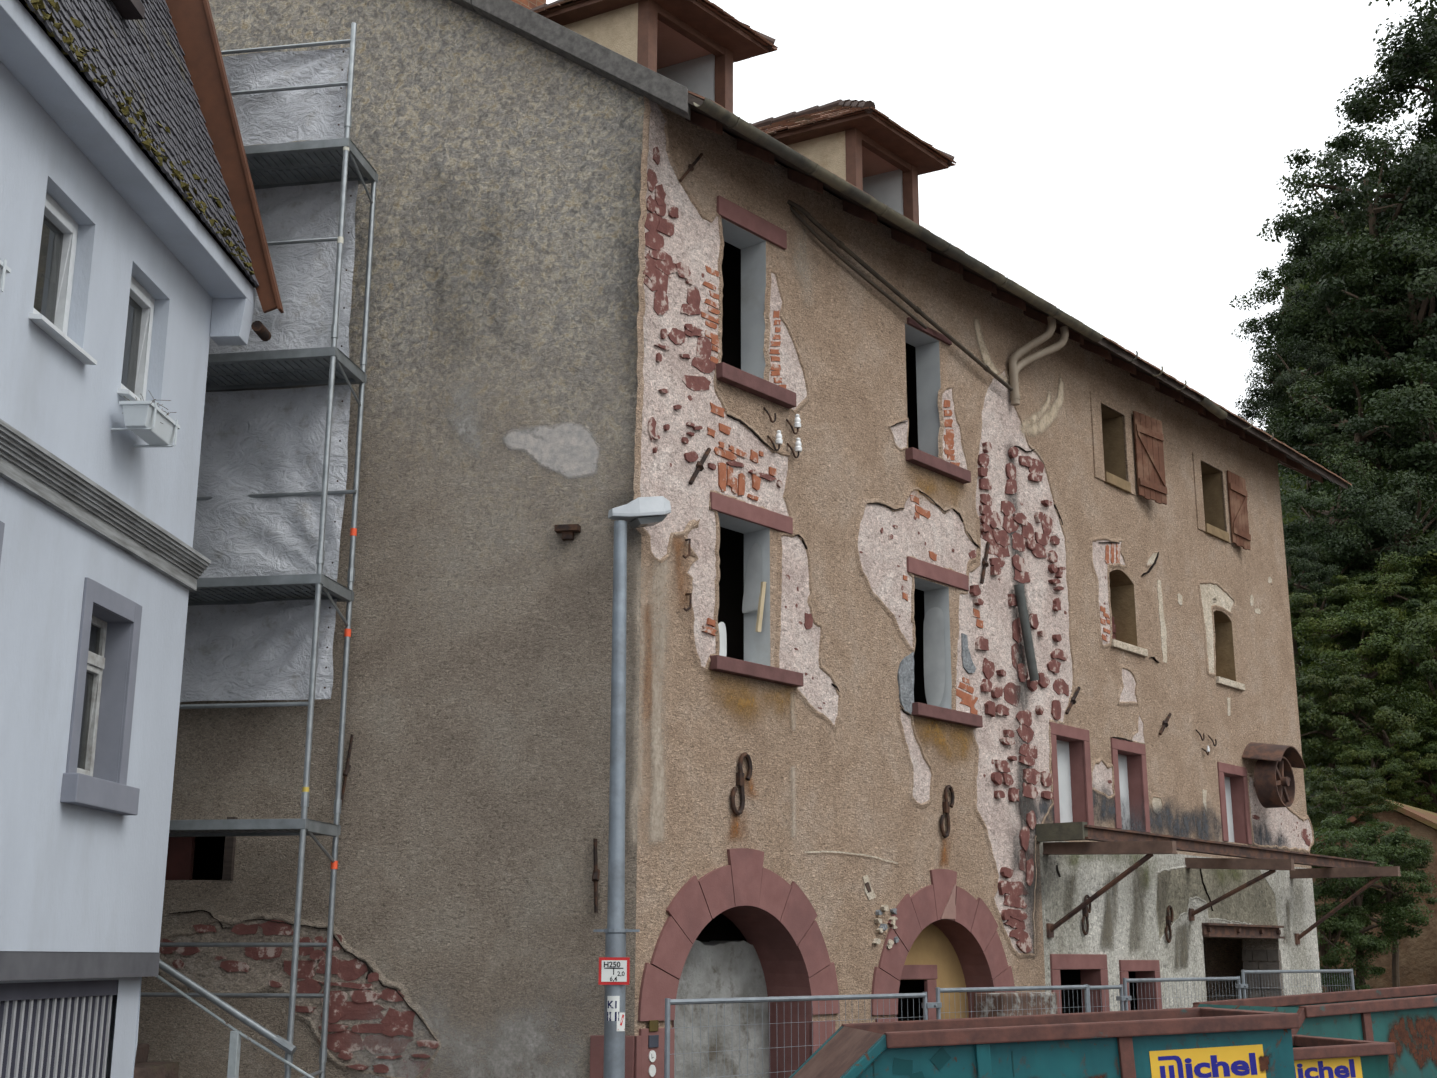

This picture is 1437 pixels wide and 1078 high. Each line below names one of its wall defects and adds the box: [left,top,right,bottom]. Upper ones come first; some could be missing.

flaking render [633,96,842,731]
flaking render [853,365,1075,959]
flaking render [1089,535,1127,650]
flaking render [1117,664,1146,745]
flaking render [1146,551,1261,678]
flaking render [158,911,444,1078]
damp [1014,742,1054,954]
flaking render [1091,756,1115,801]
damp [1102,873,1119,947]
damp [1116,854,1170,949]
flaking render [1150,795,1163,814]
damp [1176,925,1190,969]